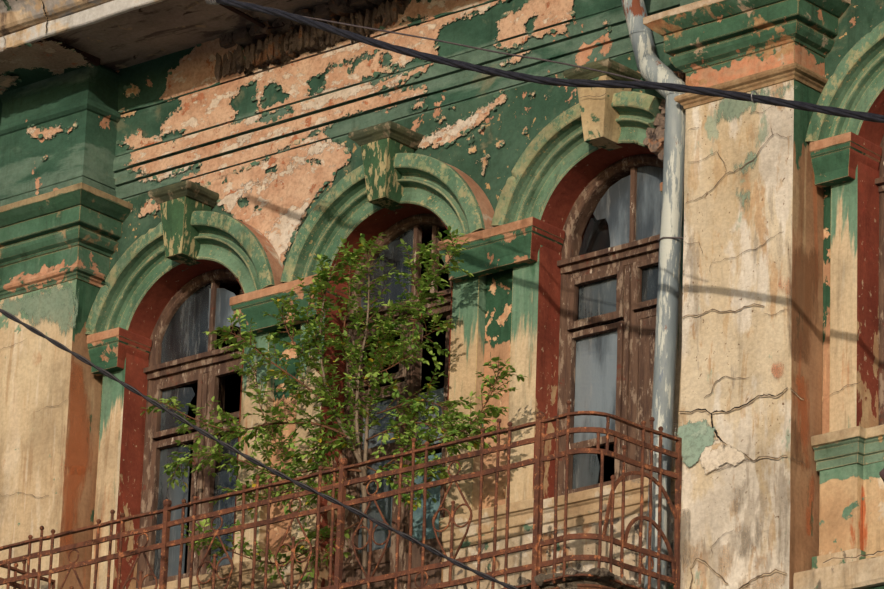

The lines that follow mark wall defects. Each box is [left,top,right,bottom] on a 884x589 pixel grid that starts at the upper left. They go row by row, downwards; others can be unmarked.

peeling [0,40,94,95]
peeling [116,0,576,265]
crack [682,303,787,318]
leakage [788,246,818,360]
crack [678,376,804,471]
crack [689,531,787,589]